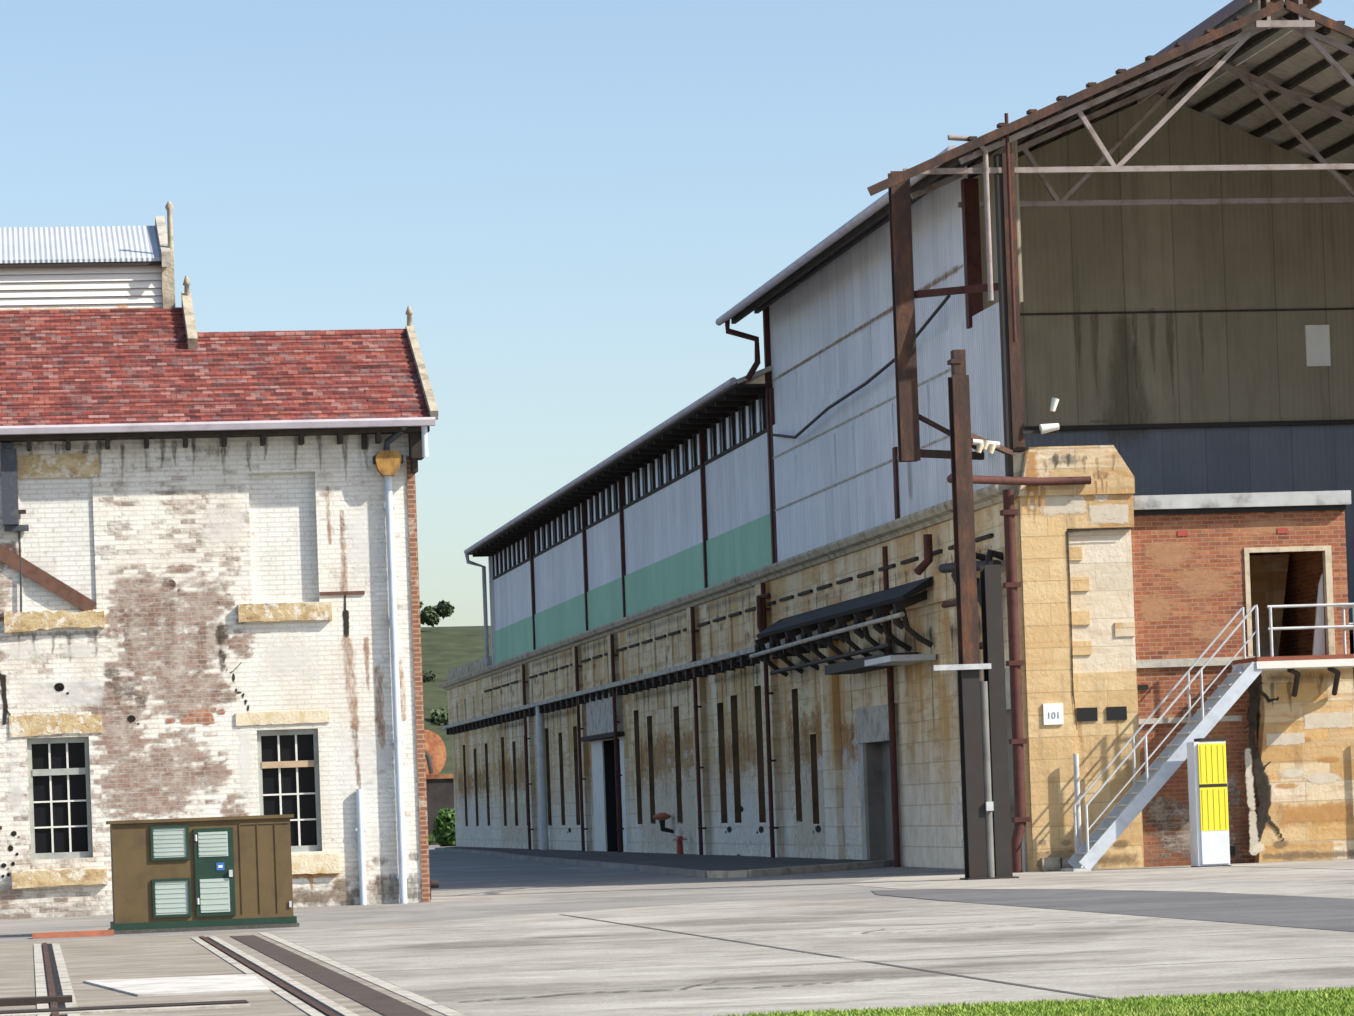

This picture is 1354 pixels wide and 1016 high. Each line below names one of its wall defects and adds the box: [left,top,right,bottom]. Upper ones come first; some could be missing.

peeling [0,542,19,661]
corrosion [328,518,347,590]
peeling [91,564,253,820]
corrosion [352,698,361,783]
corrosion [344,638,385,745]
crack [1244,674,1284,841]